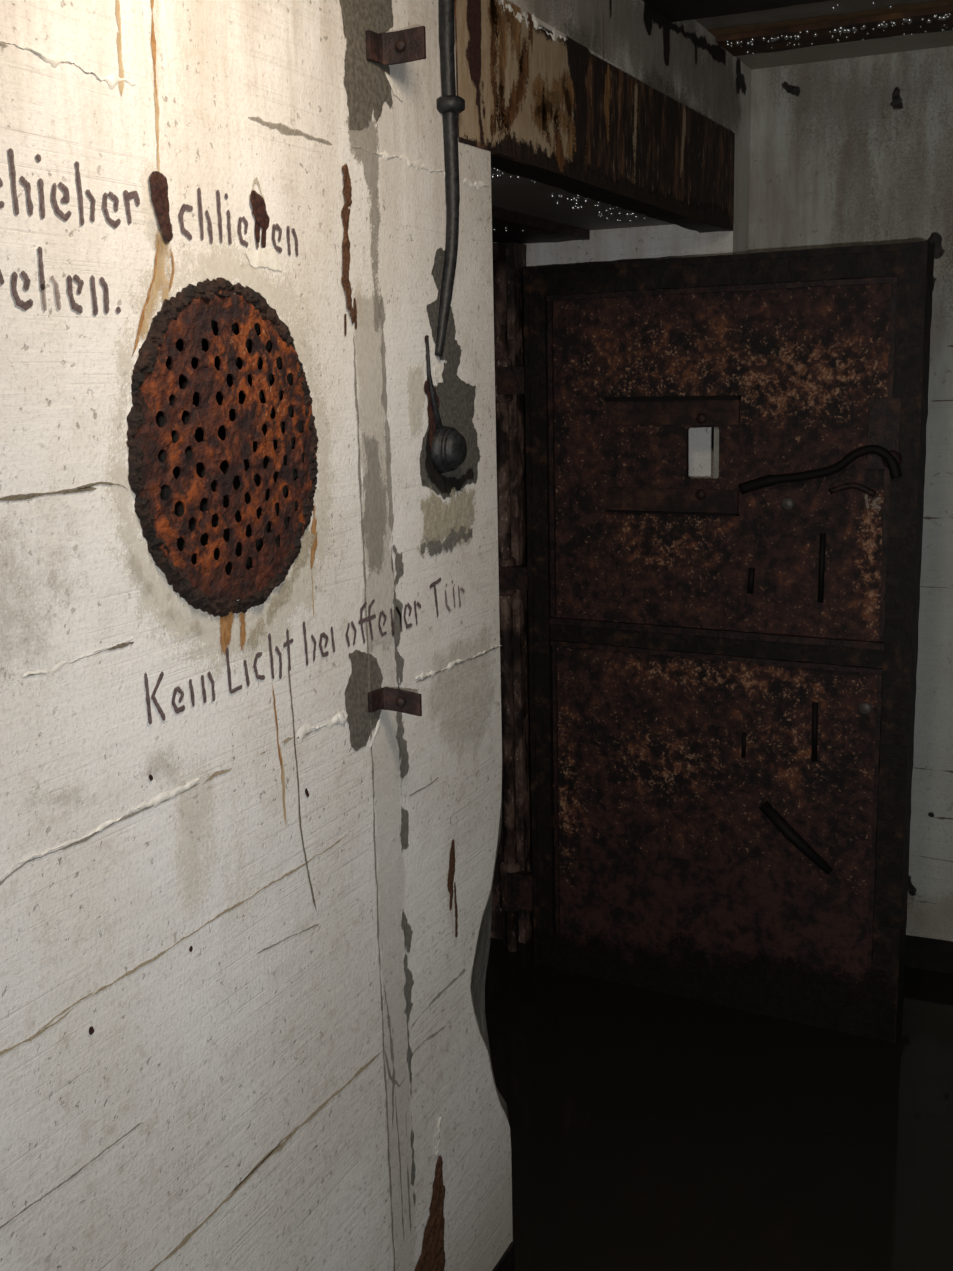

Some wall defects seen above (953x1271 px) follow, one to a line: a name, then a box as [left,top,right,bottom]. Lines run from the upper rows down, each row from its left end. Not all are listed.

corrosion [132,0,175,356]
corrosion [341,163,357,336]
damp [530,0,740,184]
corrosion [220,612,246,654]
crack [0,339,502,1271]
corrosion [447,839,458,937]
corrosion [415,1117,446,1271]